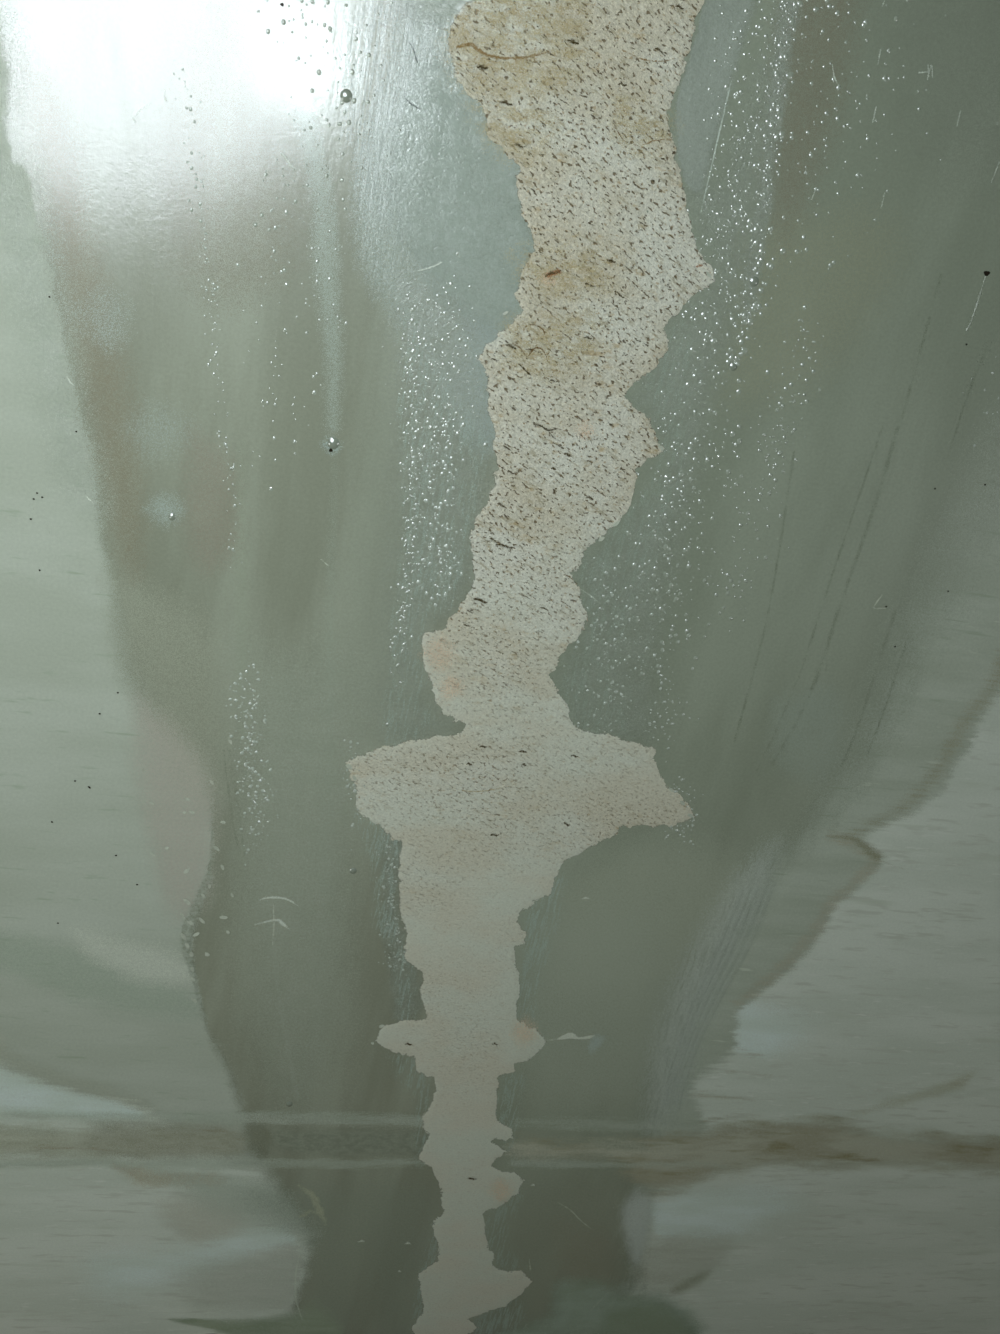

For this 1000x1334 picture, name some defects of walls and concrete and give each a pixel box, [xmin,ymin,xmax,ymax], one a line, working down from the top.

water stain [0,0,535,1334]
peeling [345,0,715,1334]
water stain [468,0,1000,1334]